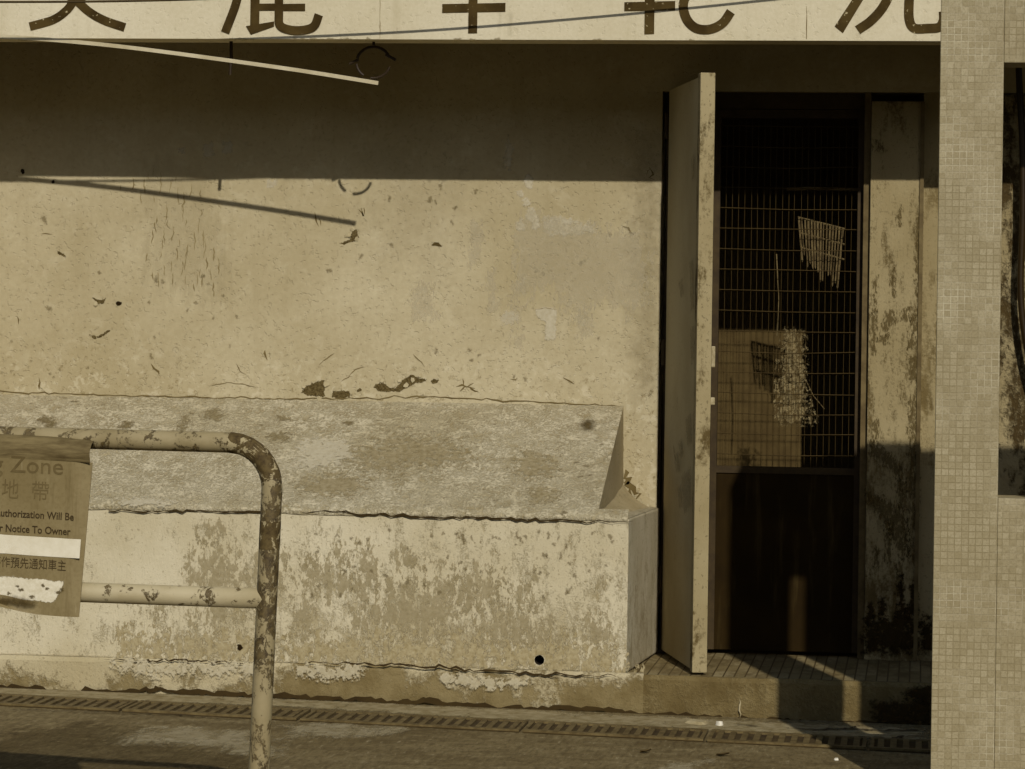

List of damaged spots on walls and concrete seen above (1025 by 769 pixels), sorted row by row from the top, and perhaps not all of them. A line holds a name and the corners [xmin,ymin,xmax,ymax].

crack [0,351,616,406]
spalling [301,373,439,401]
crack [303,469,642,524]
peeling [181,518,259,588]
peeling [275,537,645,691]
leakage [860,574,932,656]